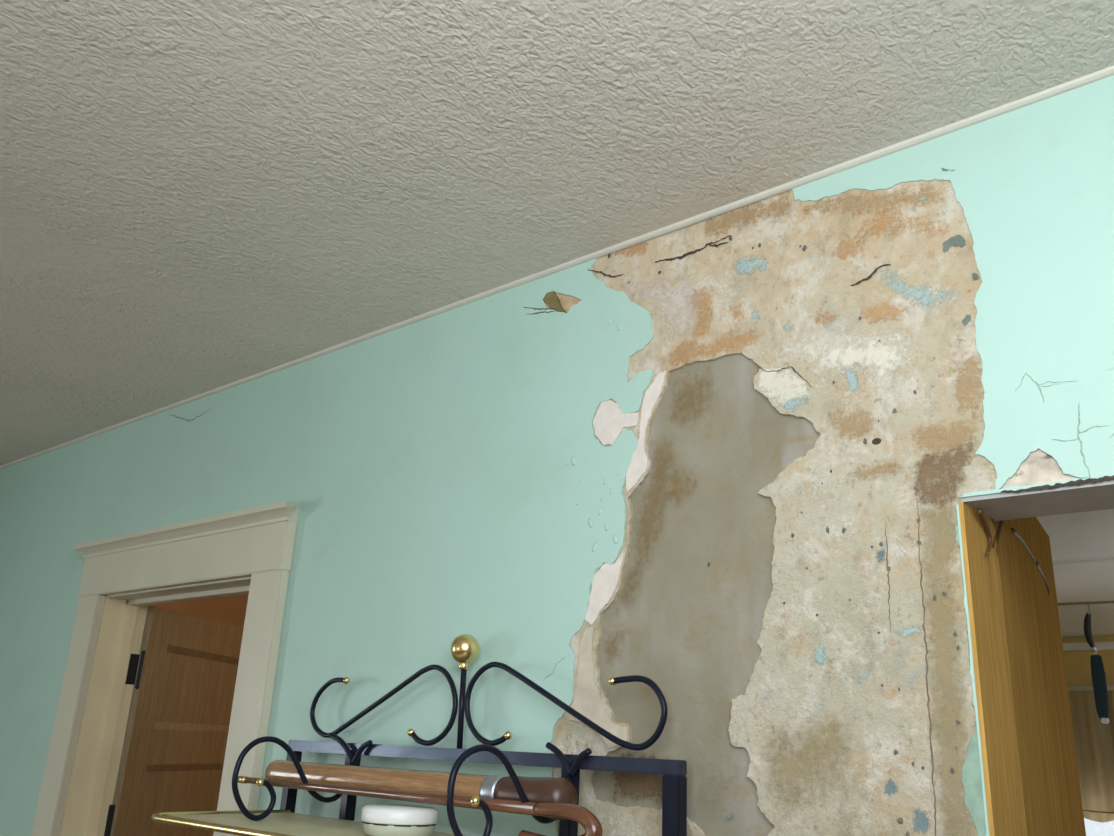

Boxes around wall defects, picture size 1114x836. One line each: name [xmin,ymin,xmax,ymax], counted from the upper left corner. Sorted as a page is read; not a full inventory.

crack [1001,373,1114,493]
peeling [551,168,1077,836]
leakage [613,772,663,800]